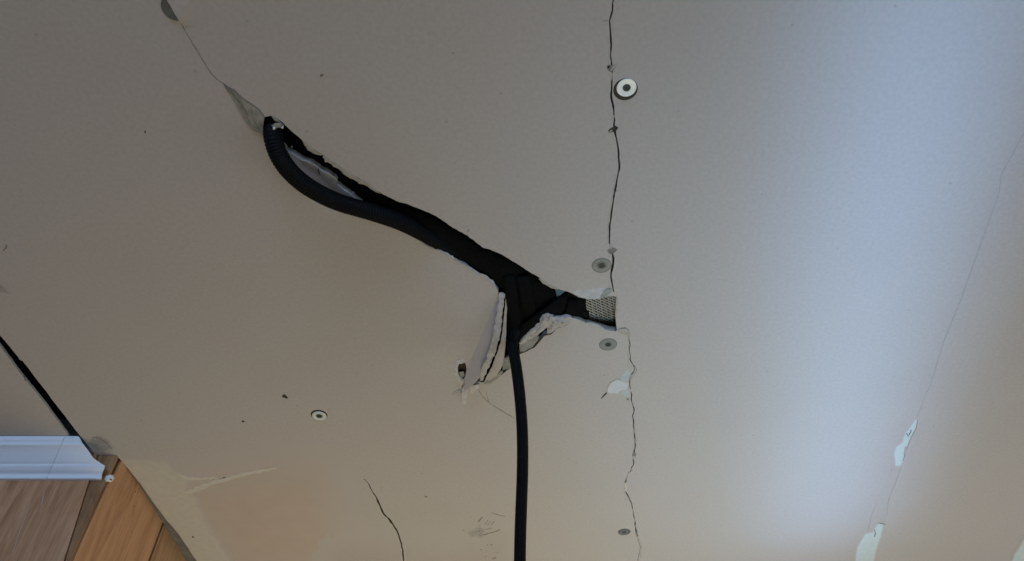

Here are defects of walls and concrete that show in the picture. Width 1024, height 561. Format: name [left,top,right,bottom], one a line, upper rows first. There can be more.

crack [603,0,620,289]
peeling [573,287,612,299]
flaking render [519,313,572,345]
crack [601,338,643,560]
peeling [893,418,918,467]
crack [364,479,404,561]
peeling [855,523,886,561]